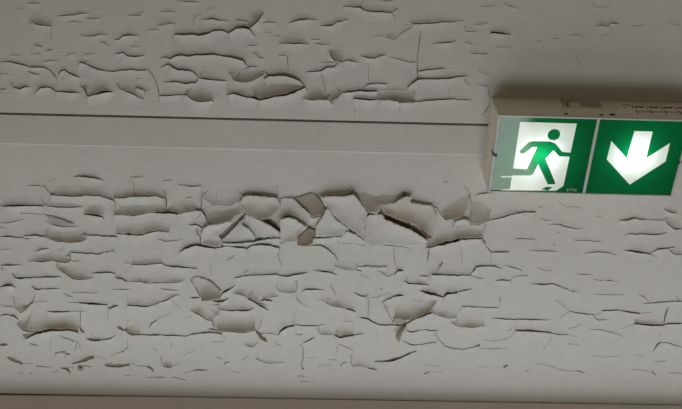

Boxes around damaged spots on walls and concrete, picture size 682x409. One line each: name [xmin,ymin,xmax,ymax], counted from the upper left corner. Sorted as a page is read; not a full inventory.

peeling [172,9,267,46]
peeling [78,80,150,107]
peeling [159,49,456,117]
peeling [0,182,536,376]
crack [291,201,682,378]